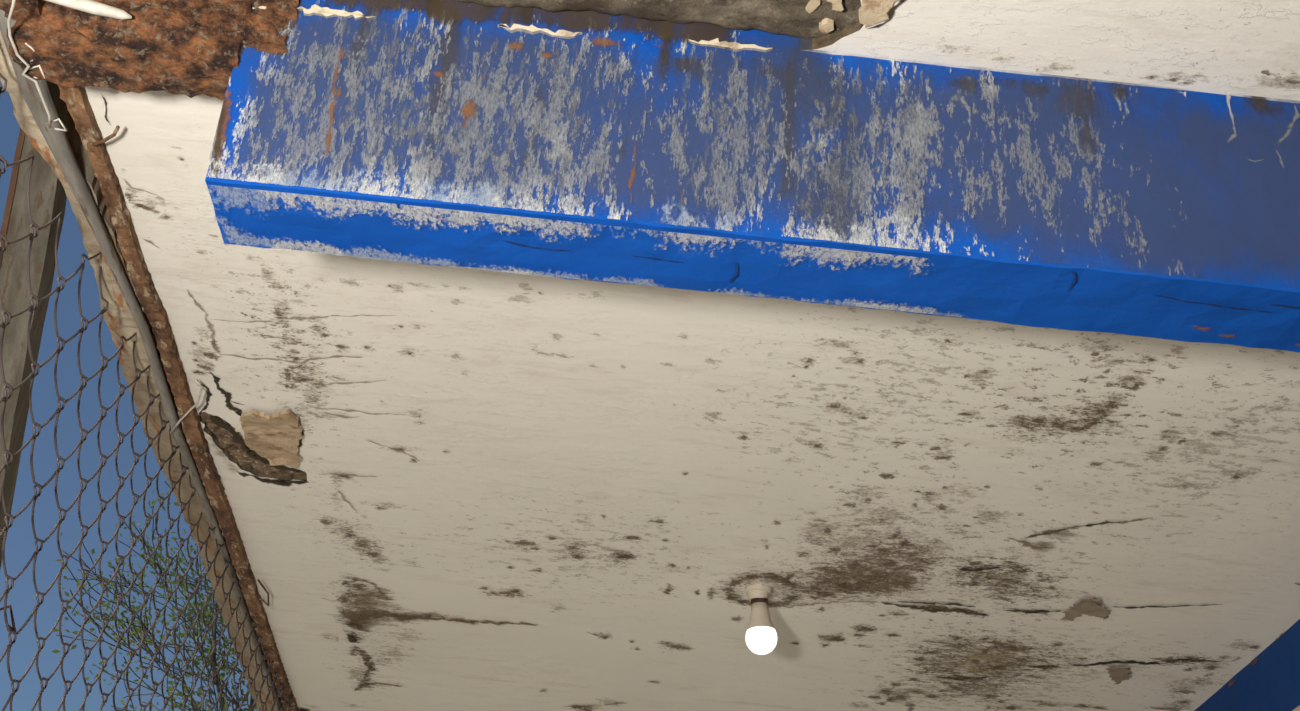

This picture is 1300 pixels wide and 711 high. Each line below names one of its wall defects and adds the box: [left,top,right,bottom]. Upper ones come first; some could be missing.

spalling [296,4,376,20]
corrosion [231,0,301,56]
spalling [455,0,906,52]
flaking render [200,410,309,486]
damp [506,537,582,561]
crack [957,517,1156,571]
damp [695,474,1105,711]
crack [884,601,1060,618]
peeling [1062,597,1111,621]
crack [1115,602,1223,610]
peeling [1106,666,1132,684]